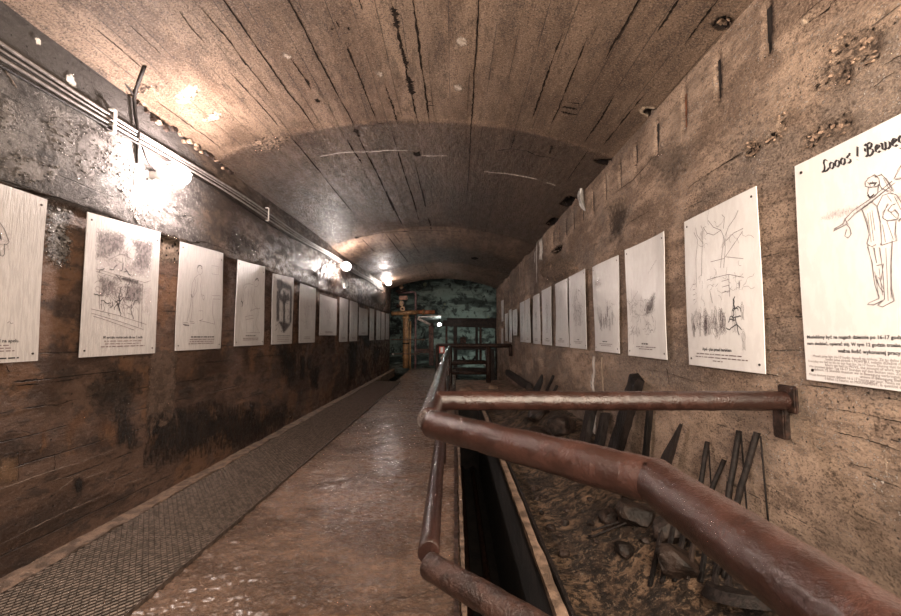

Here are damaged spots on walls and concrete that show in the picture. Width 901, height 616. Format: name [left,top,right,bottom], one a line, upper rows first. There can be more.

spalling [812,16,889,101]
spalling [798,109,857,154]